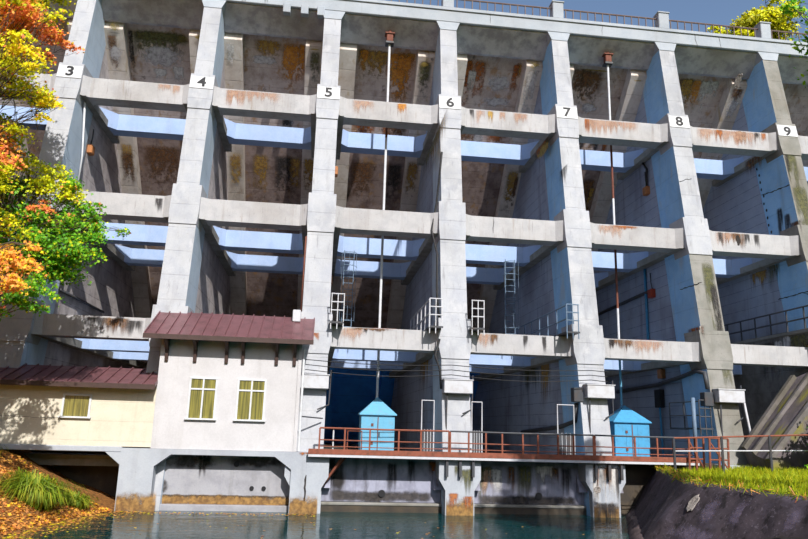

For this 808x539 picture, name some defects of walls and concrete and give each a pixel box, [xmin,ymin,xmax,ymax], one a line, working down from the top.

damp [108,31,184,79]
rust [228,90,276,101]
rust [359,50,415,111]
rust [585,119,634,130]
rust [700,129,766,142]
damp [777,155,808,232]
damp [703,266,723,331]
damp [167,455,211,472]
damp [233,457,280,467]
damp [329,459,430,502]
rust [446,493,473,516]
damp [455,466,574,505]